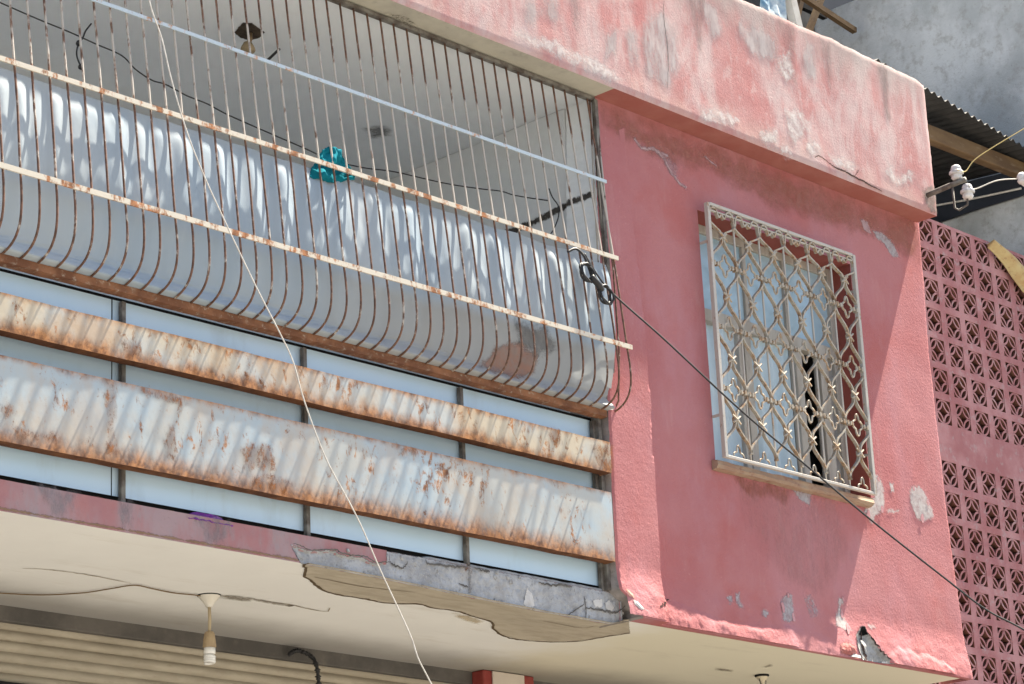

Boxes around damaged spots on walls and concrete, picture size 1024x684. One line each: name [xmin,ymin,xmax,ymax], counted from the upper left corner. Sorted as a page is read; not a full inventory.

peeling [778,54,793,80]
peeling [703,109,739,125]
peeling [762,110,854,170]
crack [634,138,687,188]
crack [816,155,881,191]
peeling [861,219,898,257]
rust [243,444,290,494]
peeling [865,475,899,520]
peeling [910,486,934,523]
spalling [292,546,644,643]
peeling [781,593,795,622]
spalling [836,597,894,664]